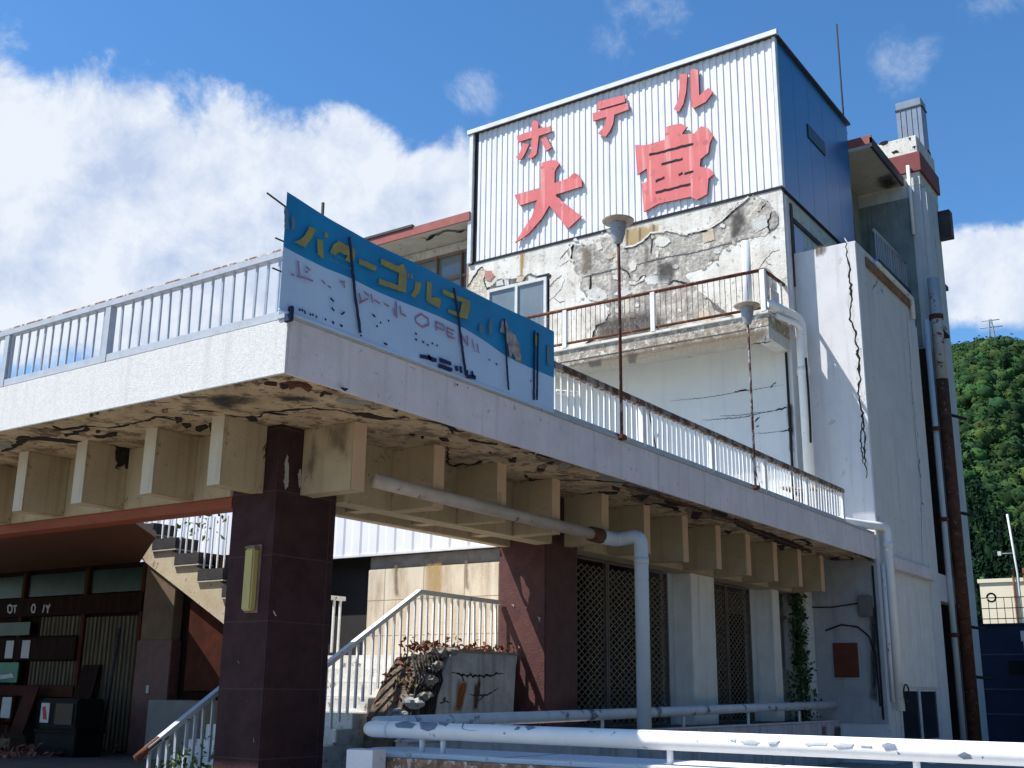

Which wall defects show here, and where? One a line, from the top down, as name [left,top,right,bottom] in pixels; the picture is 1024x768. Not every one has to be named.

spalling [467,267,551,299]
flaking render [567,195,779,344]
crack [844,237,883,478]
spalling [0,412,126,452]
spalling [283,455,302,489]
crack [96,395,594,495]
crack [676,382,788,434]
rust [919,348,953,578]
crack [440,672,504,704]
rust [941,604,967,741]